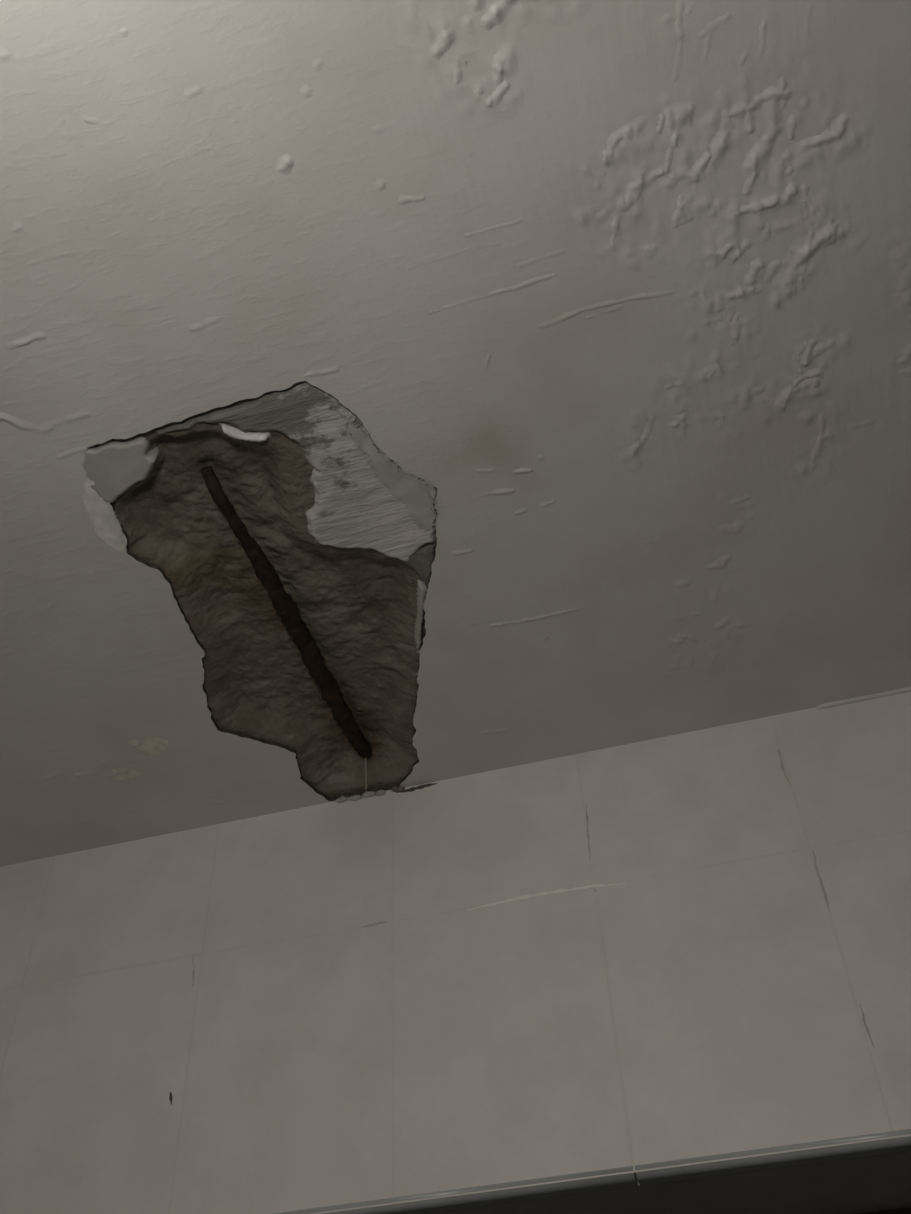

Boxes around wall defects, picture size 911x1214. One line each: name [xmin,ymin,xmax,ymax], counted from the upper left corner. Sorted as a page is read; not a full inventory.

spalling [79,381,441,803]